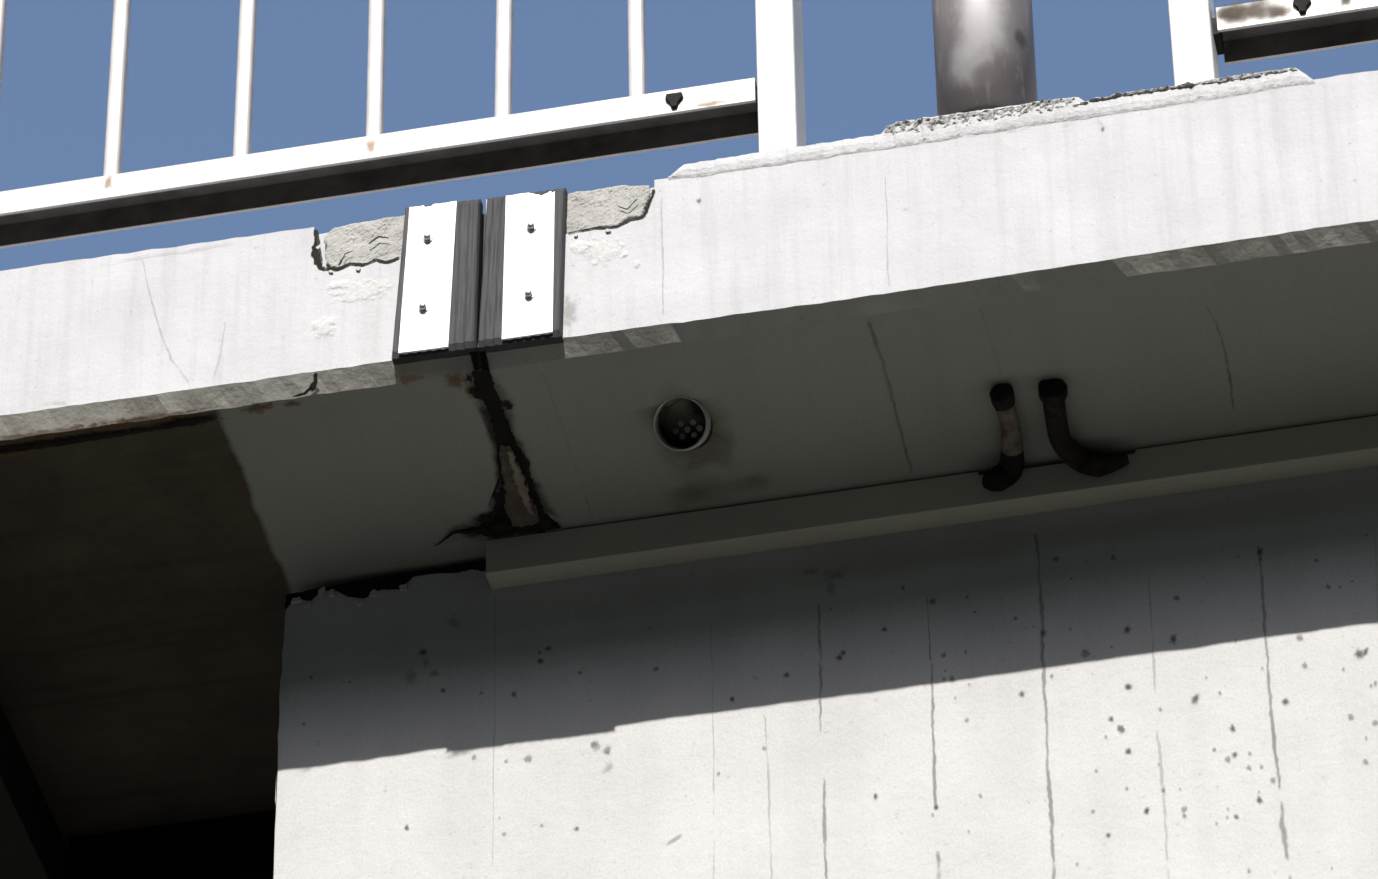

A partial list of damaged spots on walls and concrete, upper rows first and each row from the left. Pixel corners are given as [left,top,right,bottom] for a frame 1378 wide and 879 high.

spalling [567,185,655,238]
spalling [311,215,405,274]
crack [293,373,318,397]
crack [433,349,561,547]
spalling [285,560,486,610]